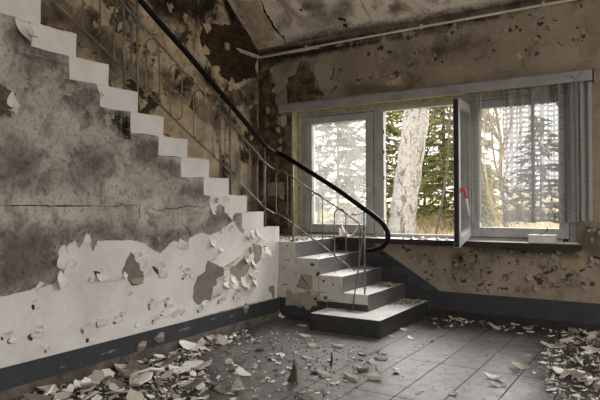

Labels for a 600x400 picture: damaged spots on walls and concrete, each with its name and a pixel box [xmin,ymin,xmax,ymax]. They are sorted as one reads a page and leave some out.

crack [260,0,286,44]
peeling [284,56,325,103]
water stain [103,110,131,140]
crack [0,204,204,220]
peeling [0,22,291,368]
peeling [278,263,328,318]
peeling [453,248,595,296]